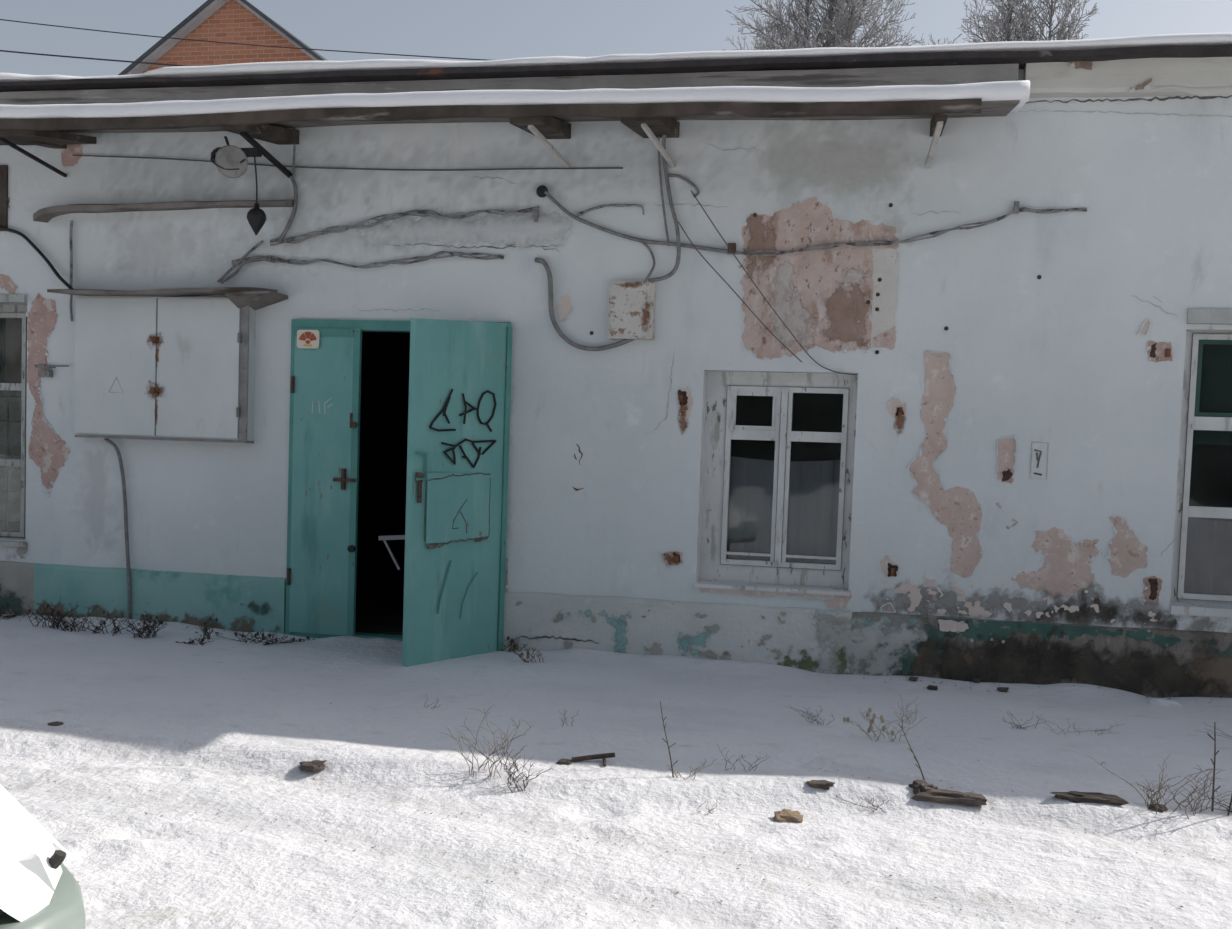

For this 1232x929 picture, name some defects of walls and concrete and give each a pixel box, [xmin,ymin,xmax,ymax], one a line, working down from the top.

crack [1019,95,1232,117]
peeling [0,274,18,294]
peeling [740,197,900,361]
peeling [26,293,70,498]
peeling [880,350,1194,650]
spalling [680,634,785,666]
peeling [699,582,852,639]
damp [810,585,1232,698]